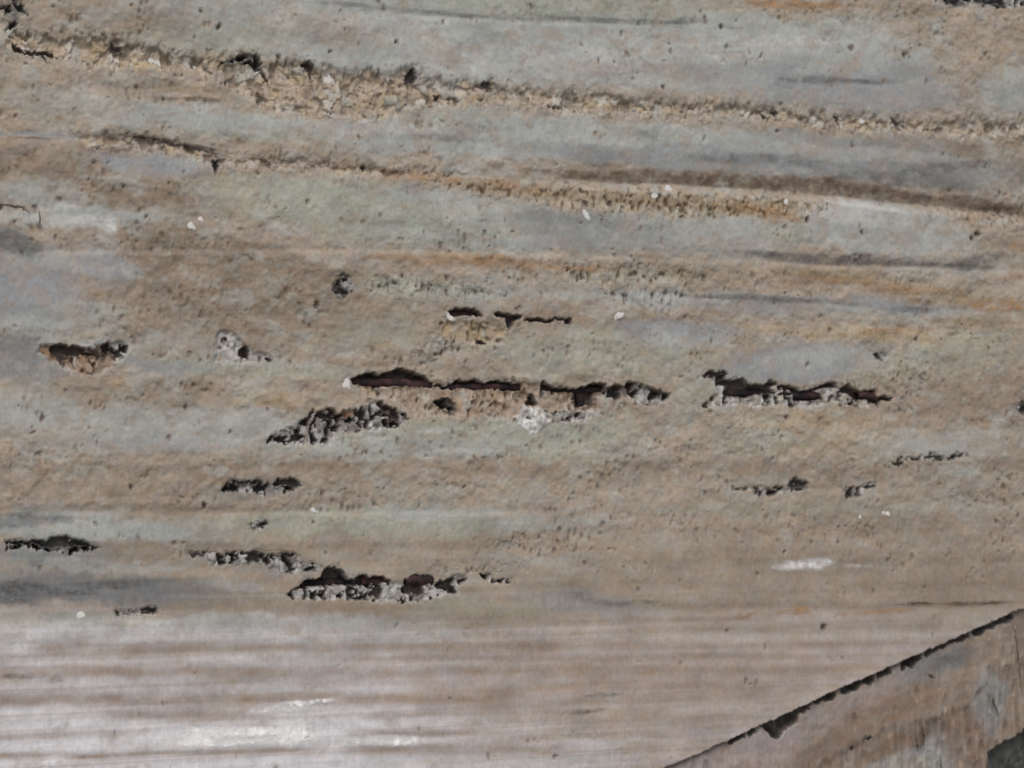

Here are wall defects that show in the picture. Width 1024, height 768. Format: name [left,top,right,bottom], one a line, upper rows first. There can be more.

spalling [36,314,128,377]
spalling [213,329,272,367]
spalling [342,271,673,436]
spalling [701,370,893,434]
spalling [285,531,534,605]